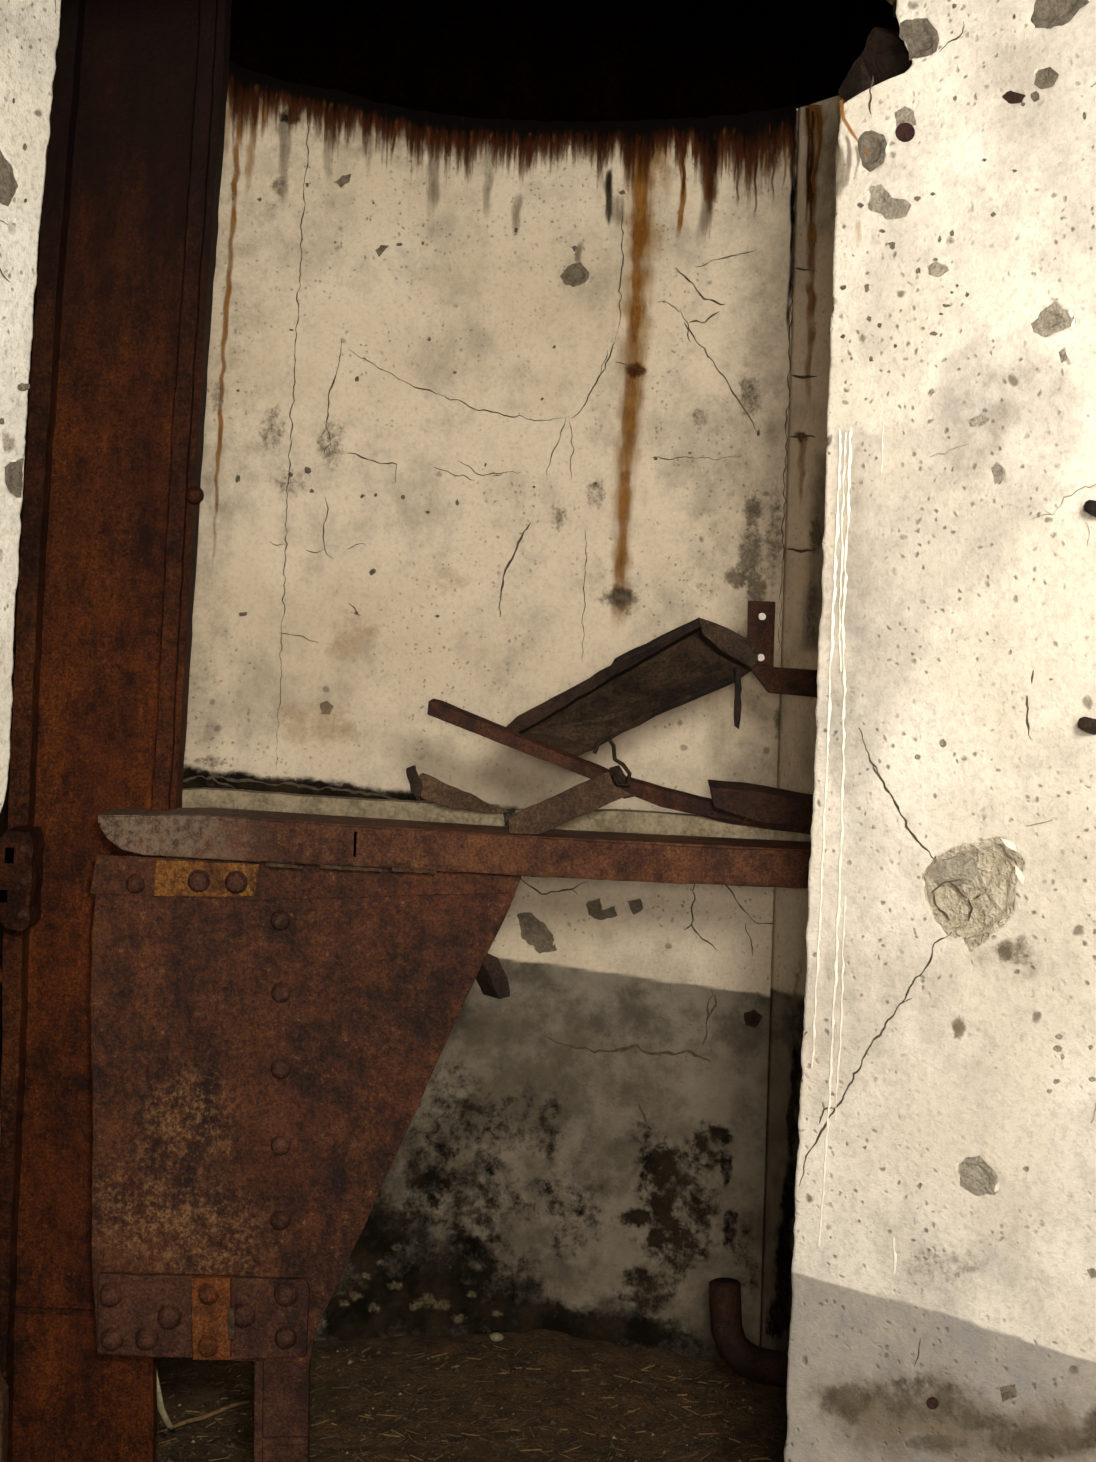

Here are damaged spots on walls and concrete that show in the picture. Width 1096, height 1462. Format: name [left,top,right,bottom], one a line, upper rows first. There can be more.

spalling [0,150,27,206]
corrosion [840,100,868,156]
spalling [899,18,939,61]
crack [183,120,644,801]
corrosion [214,61,822,610]
crack [659,128,817,651]
crack [799,728,1004,1186]
spalling [922,837,1026,952]
leakage [321,1067,757,1347]
leakage [766,1047,800,1337]